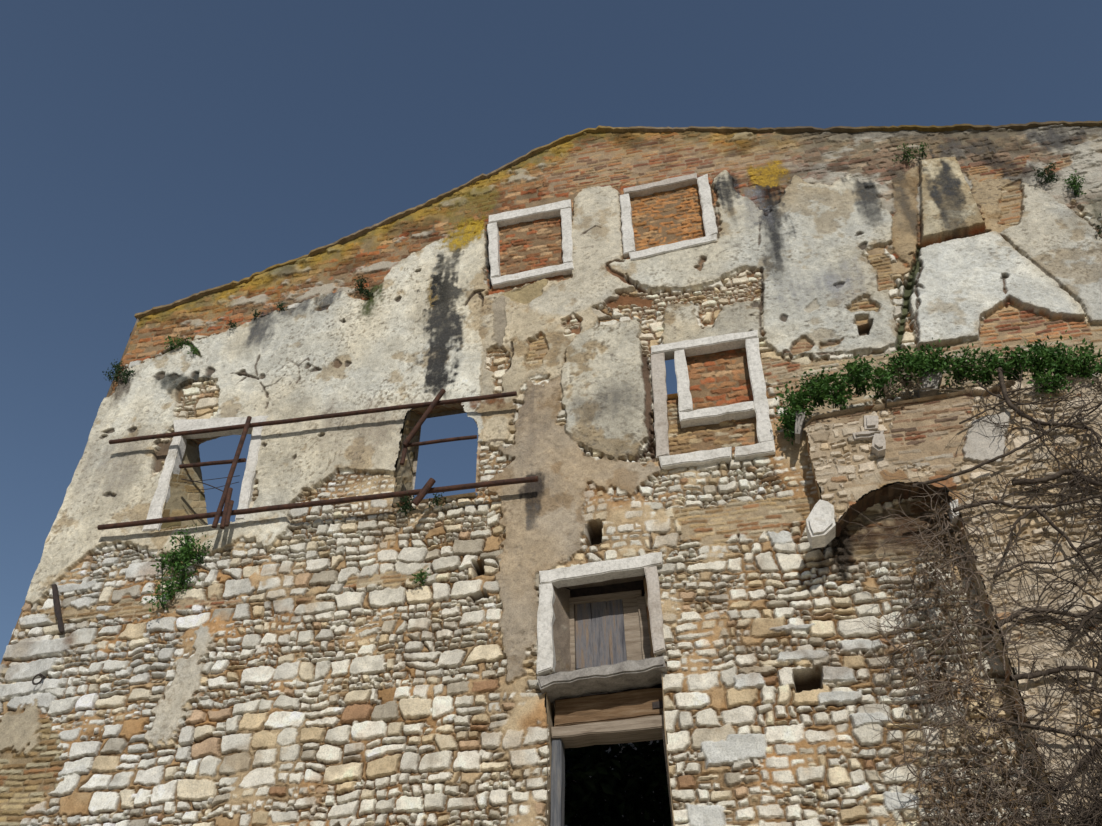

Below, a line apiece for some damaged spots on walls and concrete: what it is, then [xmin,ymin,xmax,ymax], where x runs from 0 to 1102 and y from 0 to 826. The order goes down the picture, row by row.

water stain [715,174,795,269]
water stain [923,137,1038,227]
water stain [1027,127,1085,150]
water stain [417,248,464,395]
spalling [484,279,549,394]
spalling [561,313,582,336]
spalling [603,266,764,357]
crack [895,246,925,351]
crack [1012,245,1086,313]
spalling [152,367,220,476]
spalling [289,468,400,530]